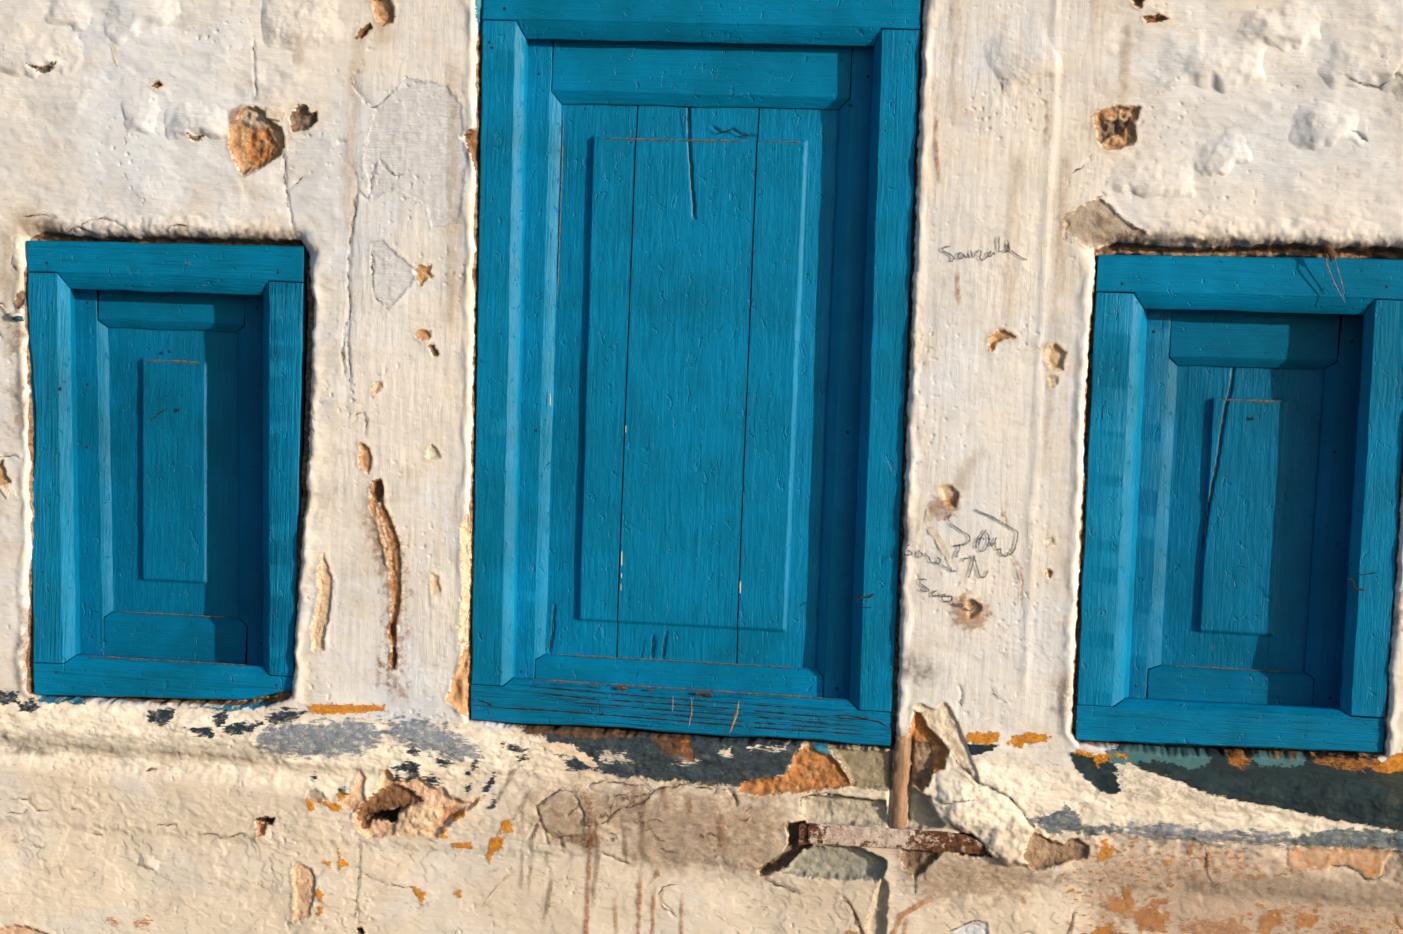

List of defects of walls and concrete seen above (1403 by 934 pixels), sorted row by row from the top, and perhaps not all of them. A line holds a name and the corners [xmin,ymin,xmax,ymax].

flaking render [370,0,396,27]
flaking render [229,105,286,174]
flaking render [1091,105,1141,150]
crack [342,162,397,381]
flaking render [359,442,402,671]
peeling [1222,746,1307,770]
flaking render [305,770,506,865]
peeling [291,860,331,923]
flaking render [1023,832,1175,933]
peeling [1187,845,1210,882]
flaking render [0,924,47,934]
peeling [950,922,988,934]